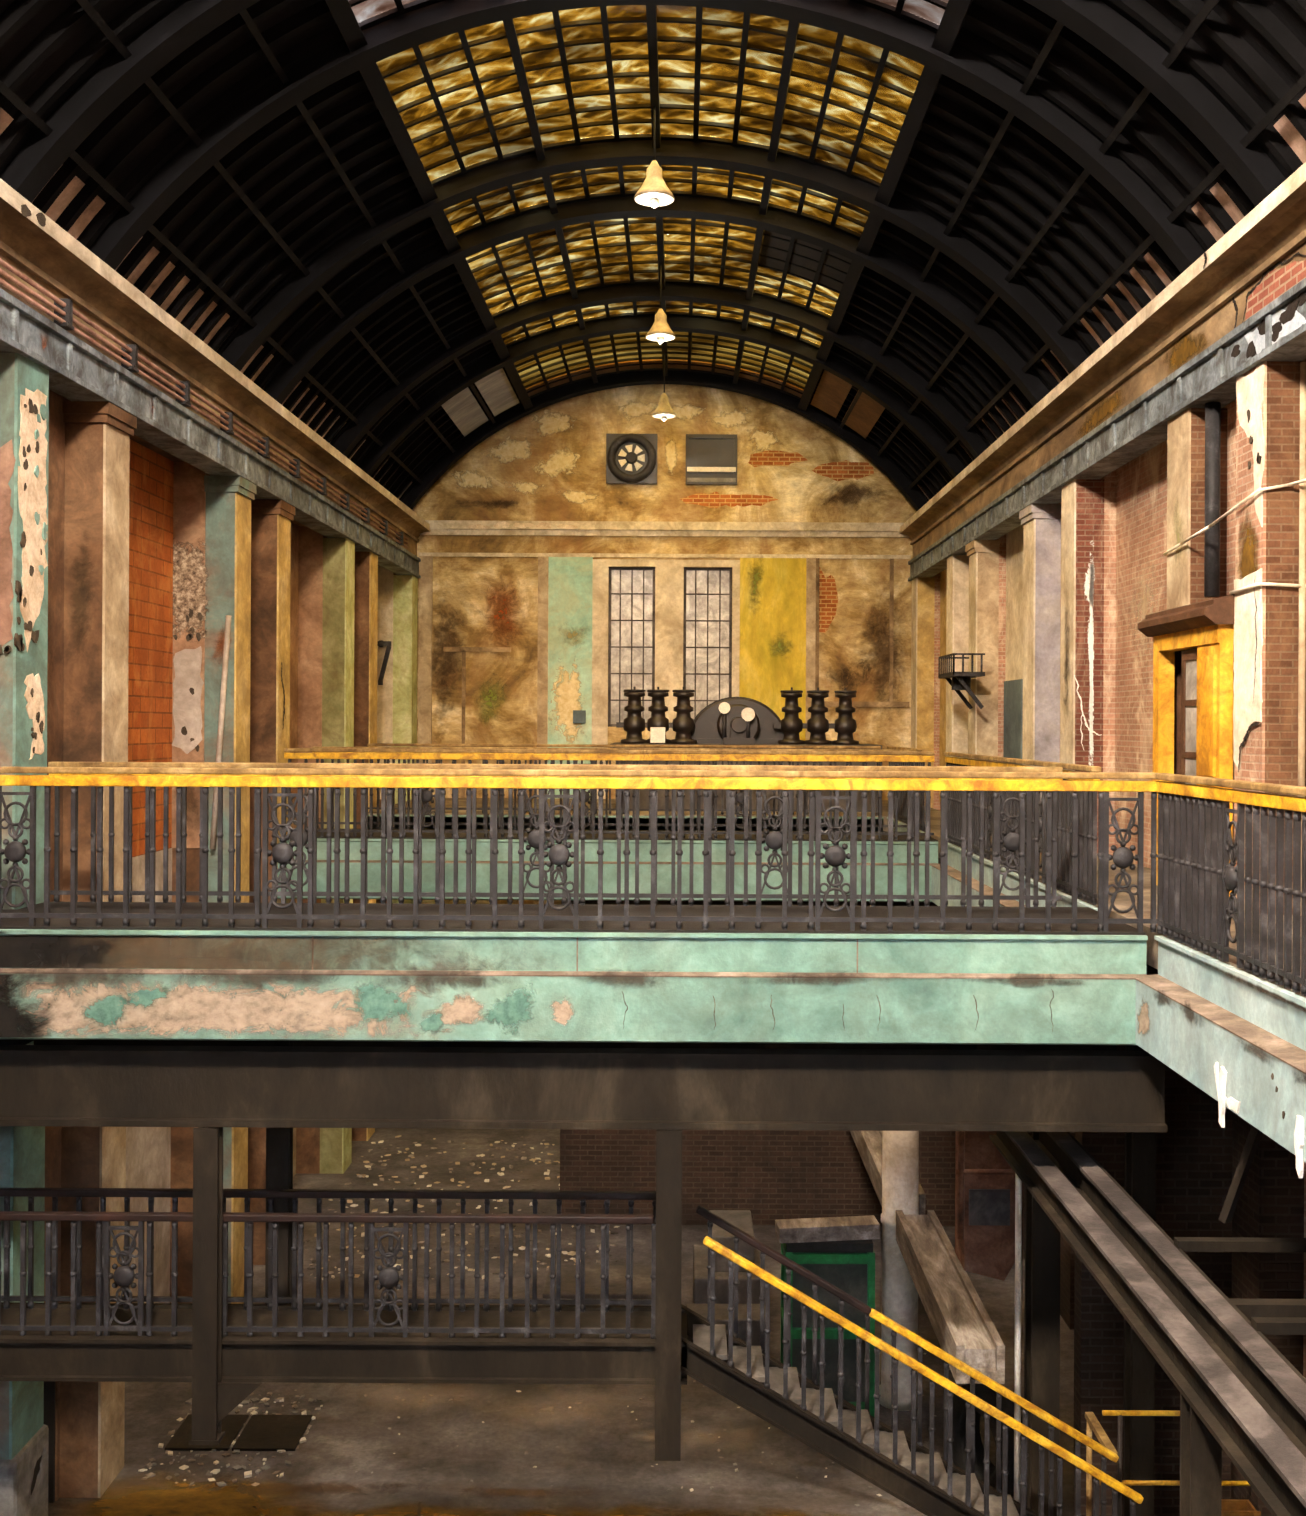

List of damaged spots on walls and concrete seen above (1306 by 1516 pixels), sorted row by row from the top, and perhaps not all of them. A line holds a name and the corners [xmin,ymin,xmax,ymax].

flaking render [1231,252,1306,527]
peeling [0,388,48,655]
leakage [432,611,463,711]
peeling [24,673,45,760]
peeling [24,981,425,1038]
peeling [435,994,484,1032]
peeling [551,1000,574,1025]